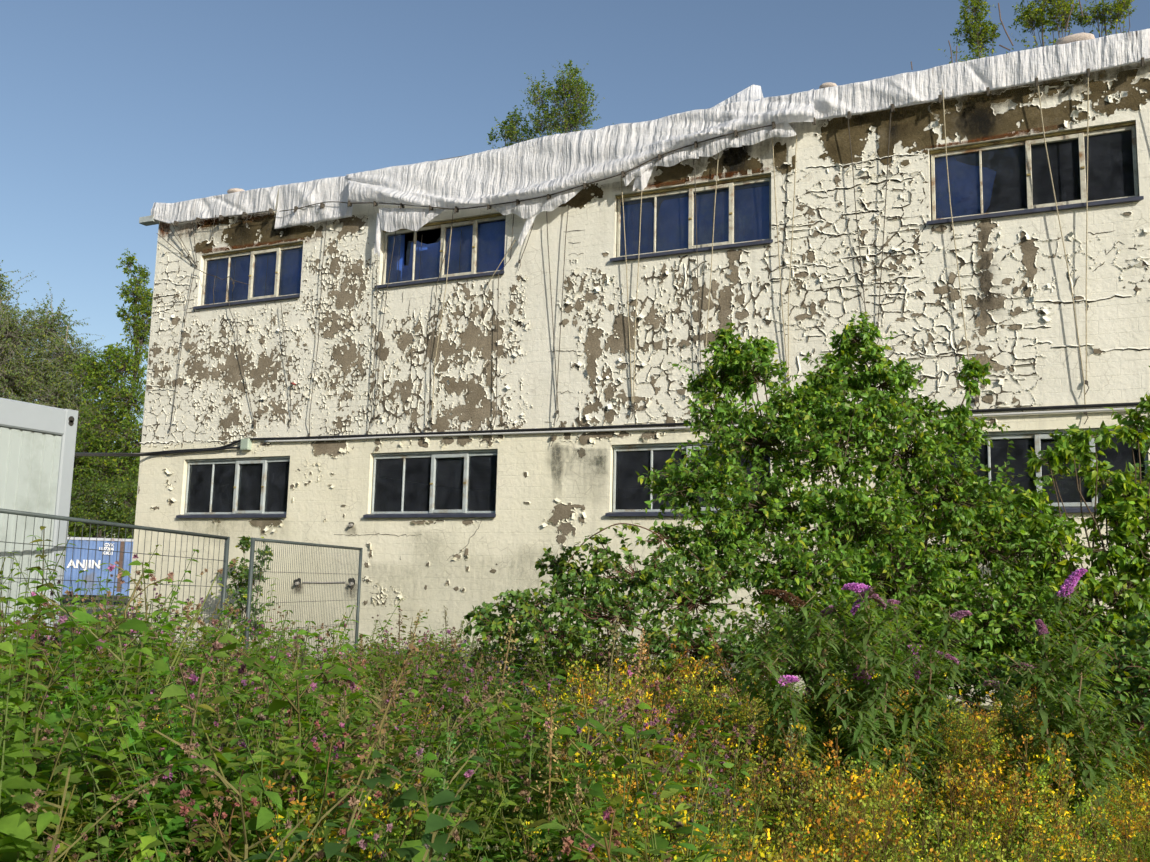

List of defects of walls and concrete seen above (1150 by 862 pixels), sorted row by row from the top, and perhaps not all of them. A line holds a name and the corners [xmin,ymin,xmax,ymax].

peeling [814,68,1150,171]
crack [151,242,207,345]
peeling [146,209,533,503]
peeling [550,248,774,458]
crack [758,149,966,397]
peeling [881,211,1150,426]
crack [1024,230,1150,352]
crack [140,384,239,459]
spalling [150,468,176,510]
peeling [248,518,284,536]
peeling [542,497,587,550]